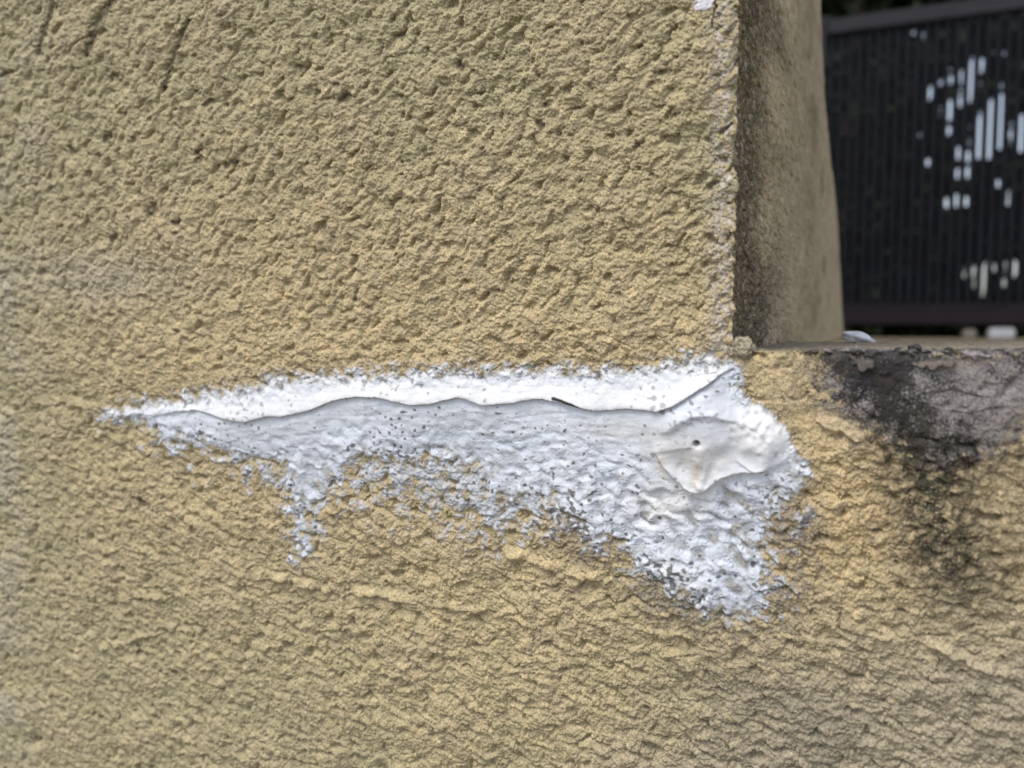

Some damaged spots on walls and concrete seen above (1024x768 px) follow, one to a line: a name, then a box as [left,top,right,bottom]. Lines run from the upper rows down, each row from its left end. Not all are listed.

leakage [806,345,1024,598]